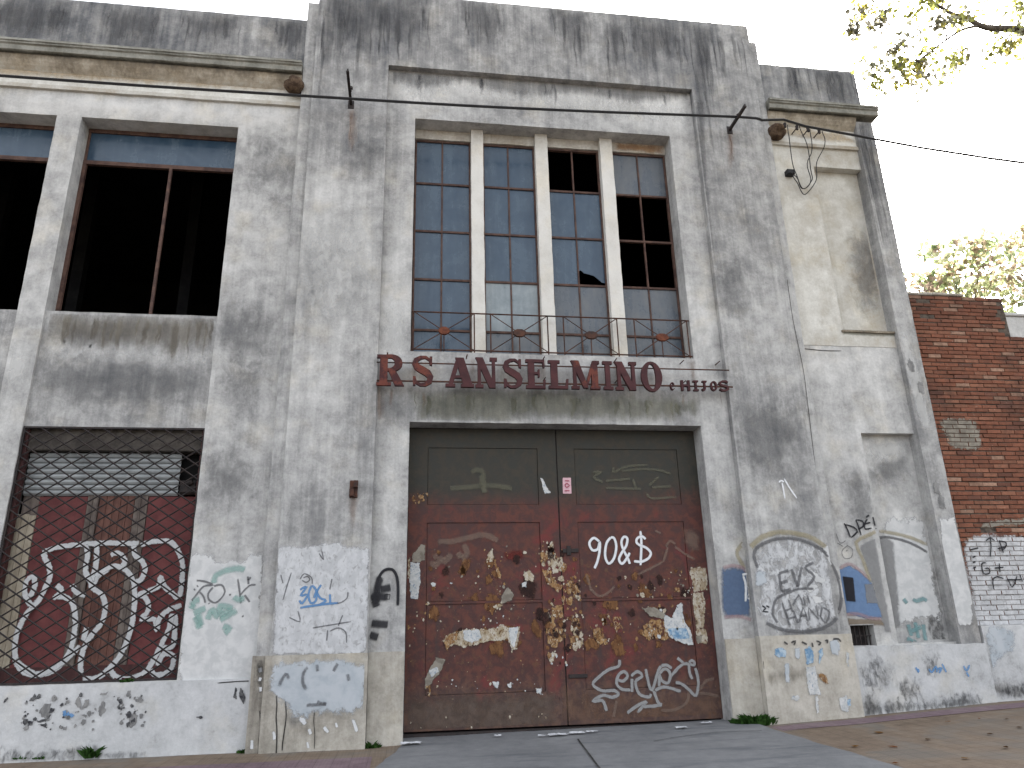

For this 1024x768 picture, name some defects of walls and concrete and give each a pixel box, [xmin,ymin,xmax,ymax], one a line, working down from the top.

peeling [408,541,708,666]
peeling [21,690,147,731]